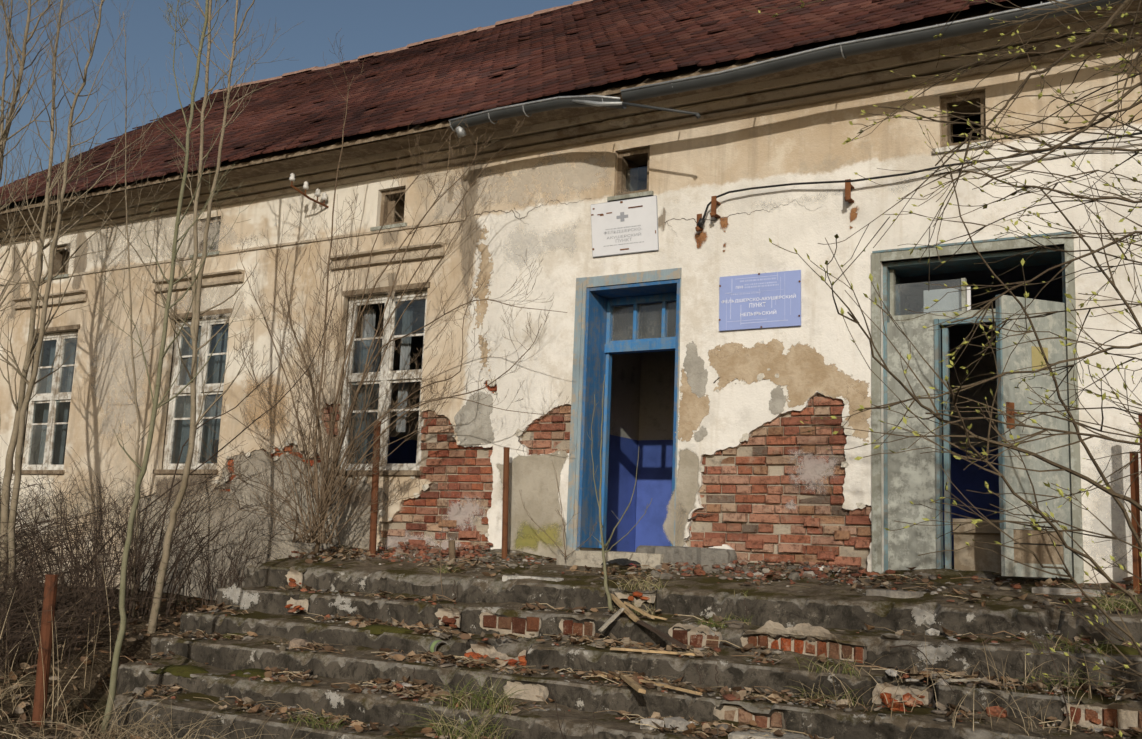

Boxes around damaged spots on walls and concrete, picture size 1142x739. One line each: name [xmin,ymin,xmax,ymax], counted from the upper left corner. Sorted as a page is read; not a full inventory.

corrosion [695,231,707,248]
spalling [515,406,571,455]
spalling [675,338,872,572]
spalling [132,411,493,614]
spalling [559,619,595,637]
spalling [668,623,723,649]
spalling [740,620,867,664]